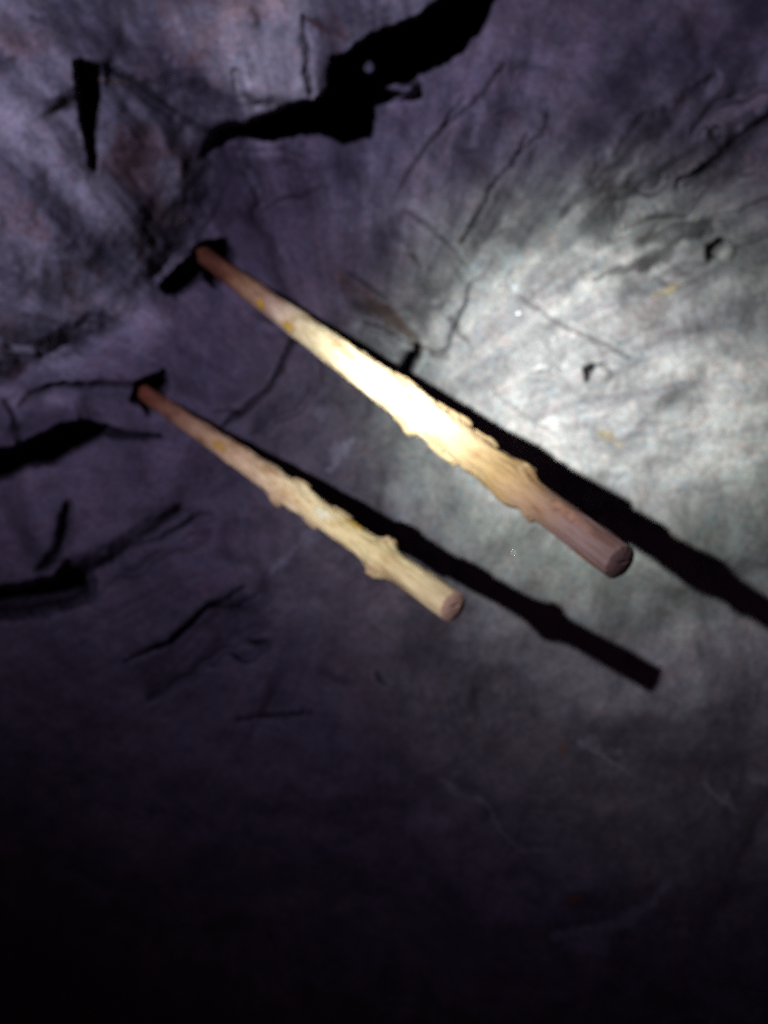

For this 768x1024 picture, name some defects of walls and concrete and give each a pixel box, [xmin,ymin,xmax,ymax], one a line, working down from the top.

crack [82,70,176,160]
crack [237,8,485,142]
crack [0,423,160,476]
crack [0,505,181,612]